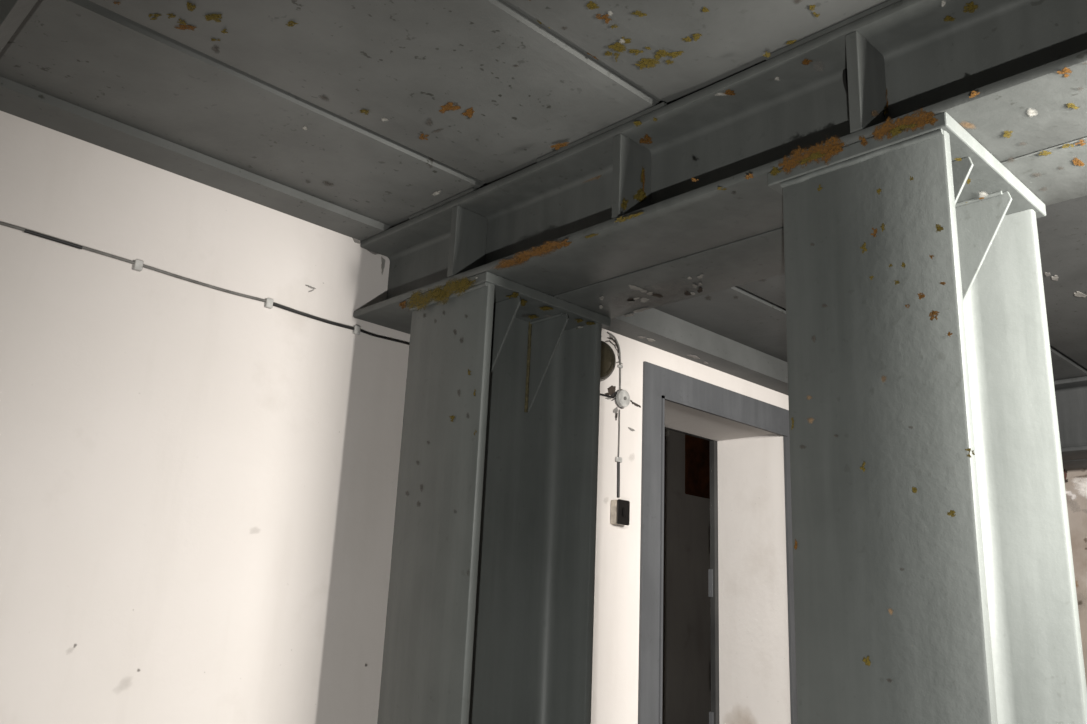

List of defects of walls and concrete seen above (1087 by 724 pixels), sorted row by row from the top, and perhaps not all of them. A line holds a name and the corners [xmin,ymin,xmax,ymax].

corrosion [148,2,228,51]
corrosion [586,1,702,69]
corrosion [859,89,938,146]
corrosion [770,135,844,176]
corrosion [492,239,572,270]
corrosion [399,276,477,321]
peeling [1063,469,1087,499]